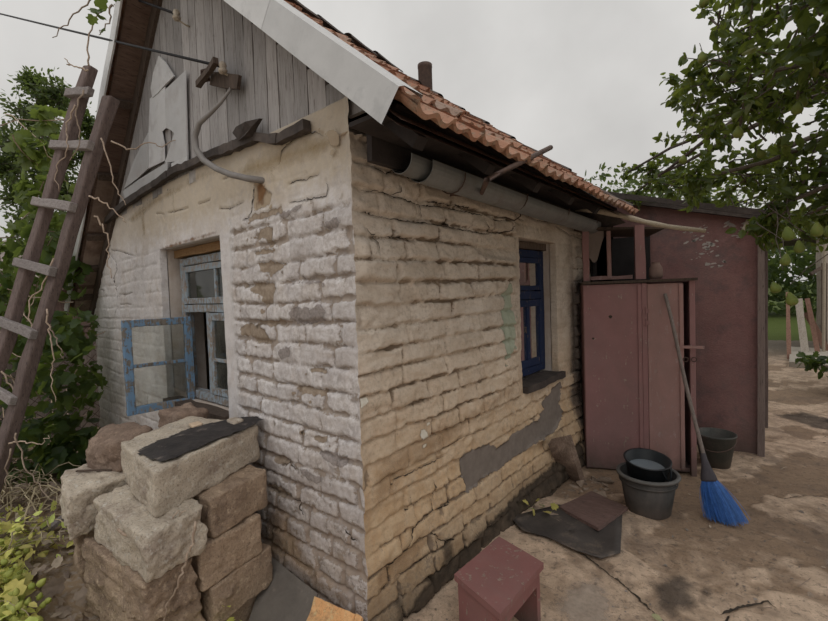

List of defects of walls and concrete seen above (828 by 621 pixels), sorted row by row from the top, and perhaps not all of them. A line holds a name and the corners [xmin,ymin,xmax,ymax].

spalling [324,218,340,229]
spalling [236,182,325,347]
peeling [500,283,517,366]
spalling [278,341,297,359]
spalling [292,385,329,404]
spalling [269,450,290,467]
spalling [314,435,349,467]
spalling [459,382,563,493]
spalling [268,483,291,503]
damp [399,462,570,621]
crack [581,553,664,621]
crack [720,600,776,621]